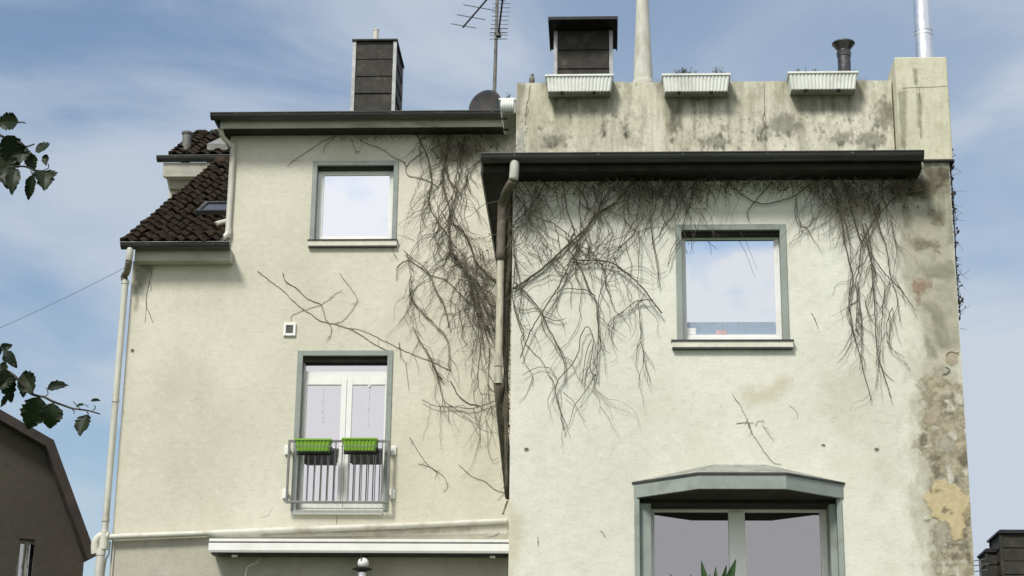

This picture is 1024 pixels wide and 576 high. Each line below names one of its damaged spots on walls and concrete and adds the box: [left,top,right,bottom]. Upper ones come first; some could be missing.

water stain [889,164,952,241]
peeling [913,351,974,576]